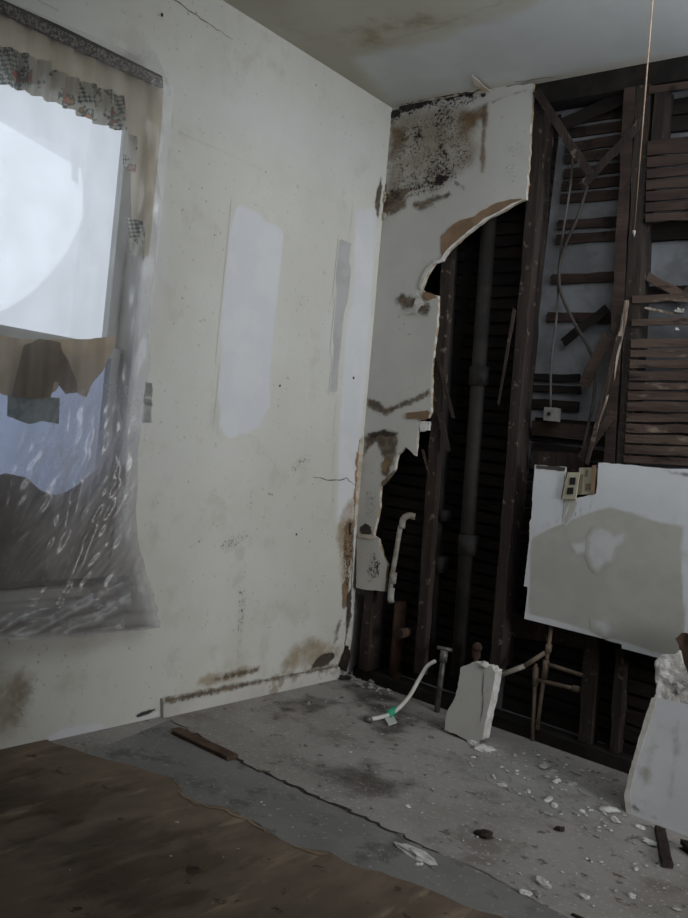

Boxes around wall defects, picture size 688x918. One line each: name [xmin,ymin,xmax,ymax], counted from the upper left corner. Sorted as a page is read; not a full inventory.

crack [174,0,233,40]
mould [384,89,488,215]
peeling [375,181,387,220]
leakage [340,520,354,608]
peeling [339,436,376,672]
leakage [312,643,334,669]